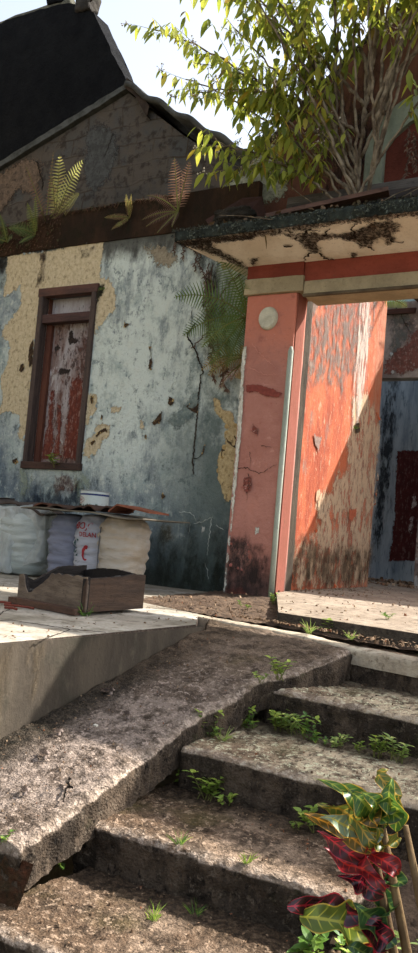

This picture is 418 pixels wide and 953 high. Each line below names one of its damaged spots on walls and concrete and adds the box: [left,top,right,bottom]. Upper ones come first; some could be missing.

spalling [0,158,45,211]
water stain [177,211,418,316]
peeling [0,242,122,461]
peeling [383,316,418,375]
spalling [140,396,174,439]
peeling [211,345,282,591]
peeling [292,392,380,590]
water stain [293,381,397,588]
spalling [408,496,418,582]